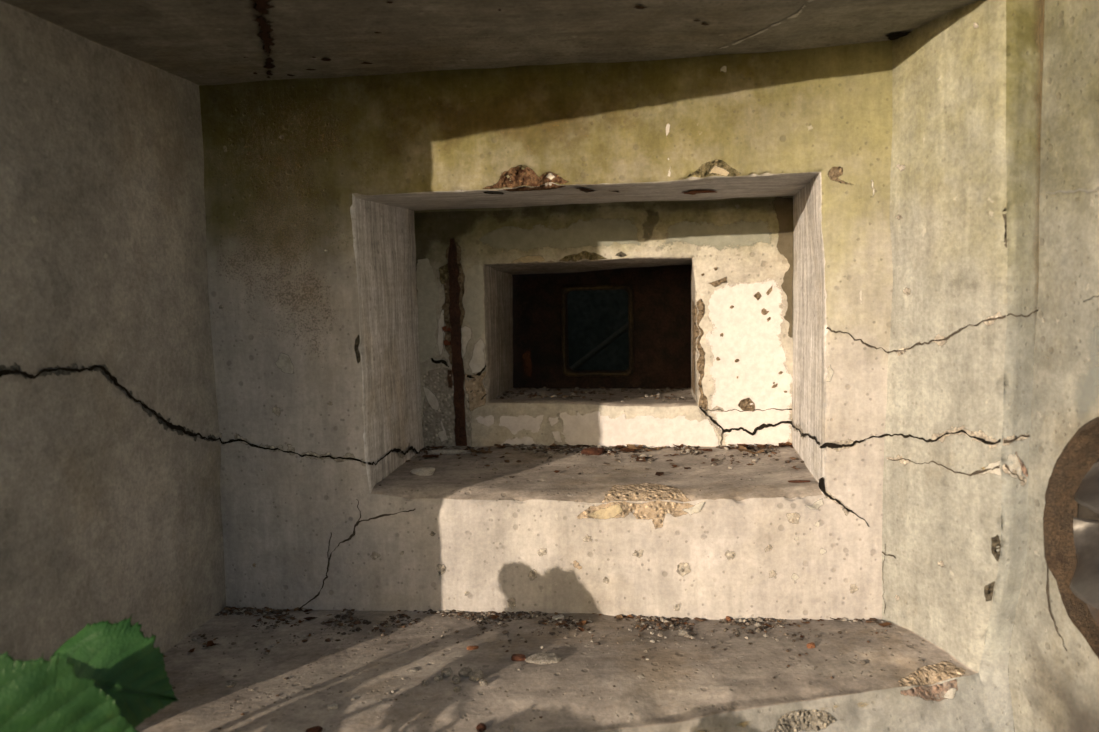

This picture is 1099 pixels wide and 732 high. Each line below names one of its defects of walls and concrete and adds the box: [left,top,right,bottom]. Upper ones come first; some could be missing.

corrosion [252,0,275,78]
spalling [483,165,568,194]
peeling [480,217,641,263]
peeling [658,220,774,251]
peeling [422,238,793,448]
crack [826,309,1038,356]
crack [0,362,420,466]
crack [699,406,1030,486]
spalling [577,483,705,529]
crack [818,477,869,527]
crack [298,499,415,609]
spalling [899,661,966,701]